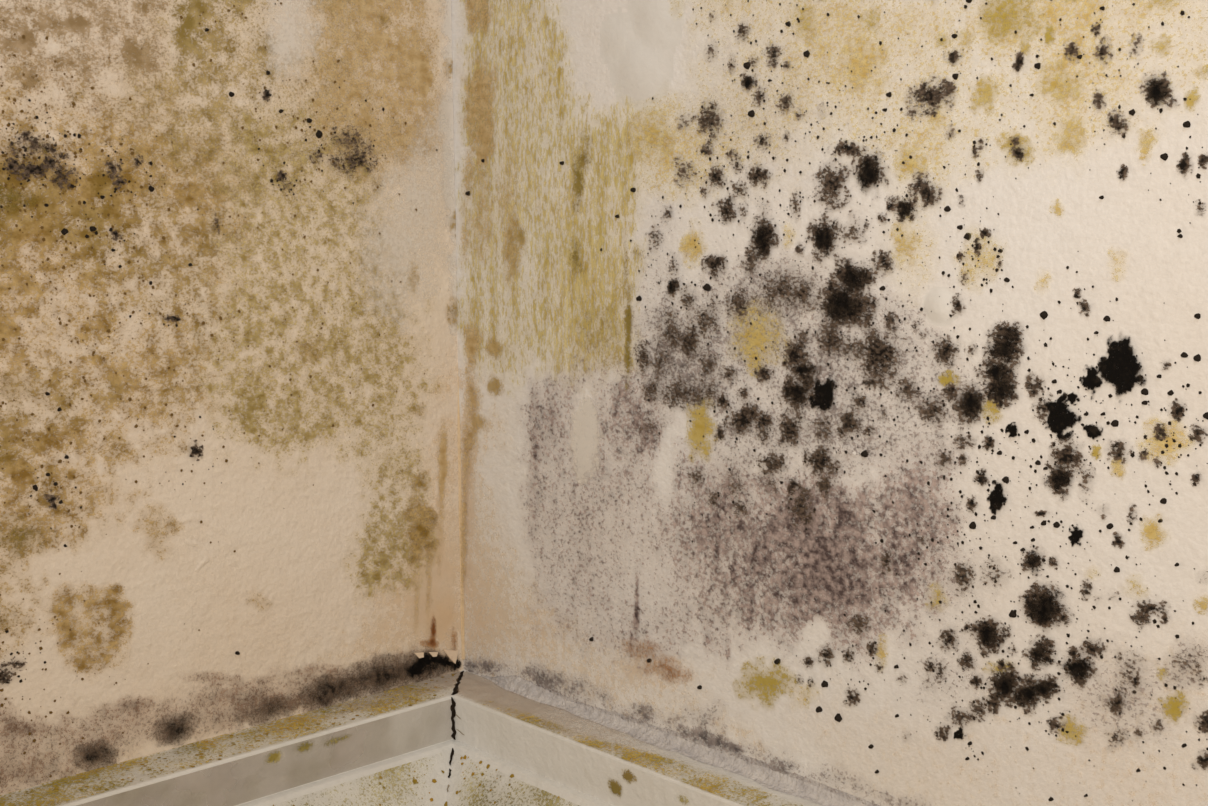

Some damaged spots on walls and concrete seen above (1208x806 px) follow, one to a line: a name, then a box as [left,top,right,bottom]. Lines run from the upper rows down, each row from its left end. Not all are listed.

leakage [0,0,457,806]
peeling [414,649,458,664]
crack [444,671,464,806]
leakage [447,0,1208,775]